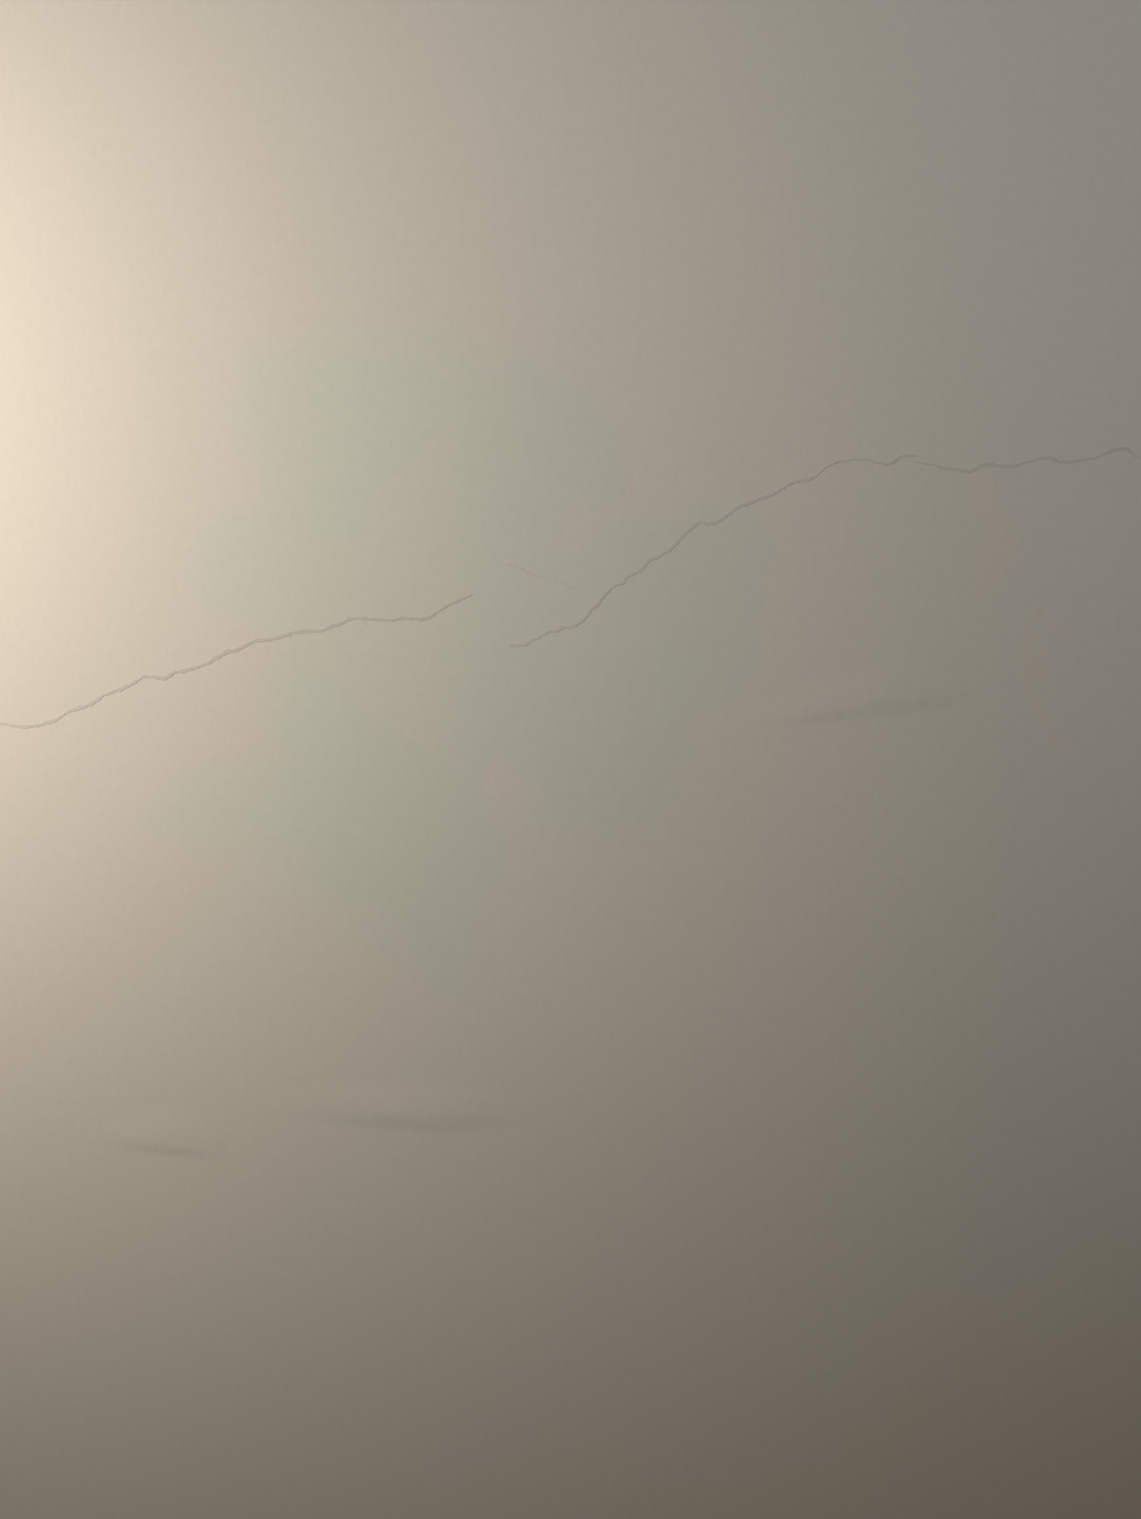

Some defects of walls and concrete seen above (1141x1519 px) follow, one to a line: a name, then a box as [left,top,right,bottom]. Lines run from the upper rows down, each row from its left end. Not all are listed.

crack [508,447,1141,647]
crack [0,594,474,729]